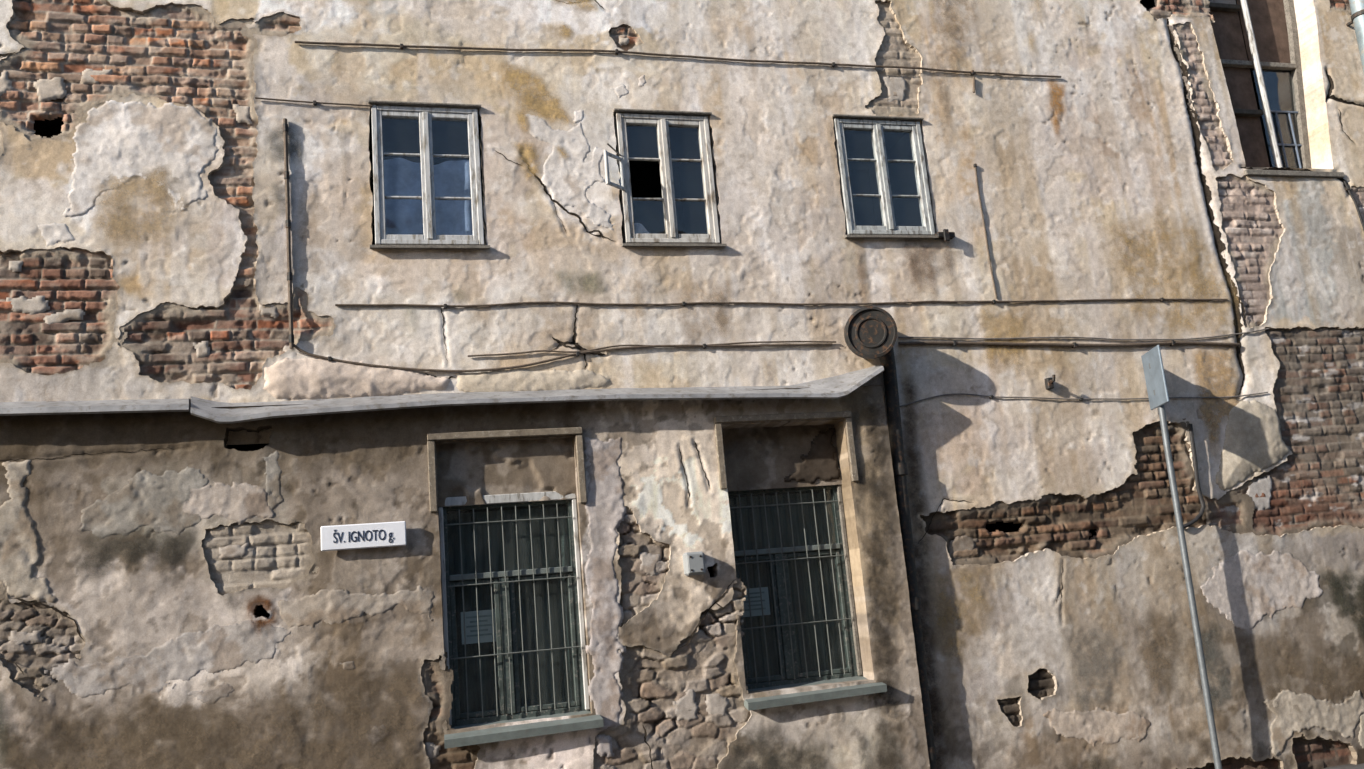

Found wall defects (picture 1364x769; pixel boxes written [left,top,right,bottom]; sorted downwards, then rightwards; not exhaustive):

flaking render [865,1,922,121]
flaking render [0,0,336,390]
crack [495,150,614,241]
flaking render [920,0,1364,630]
peeling [0,443,435,704]
peeling [584,437,626,757]
leakage [1325,573,1364,636]
leakage [0,672,428,769]
flaking render [421,652,480,769]
peeling [673,689,729,722]
peeling [997,668,1151,746]
peeling [1187,689,1364,769]